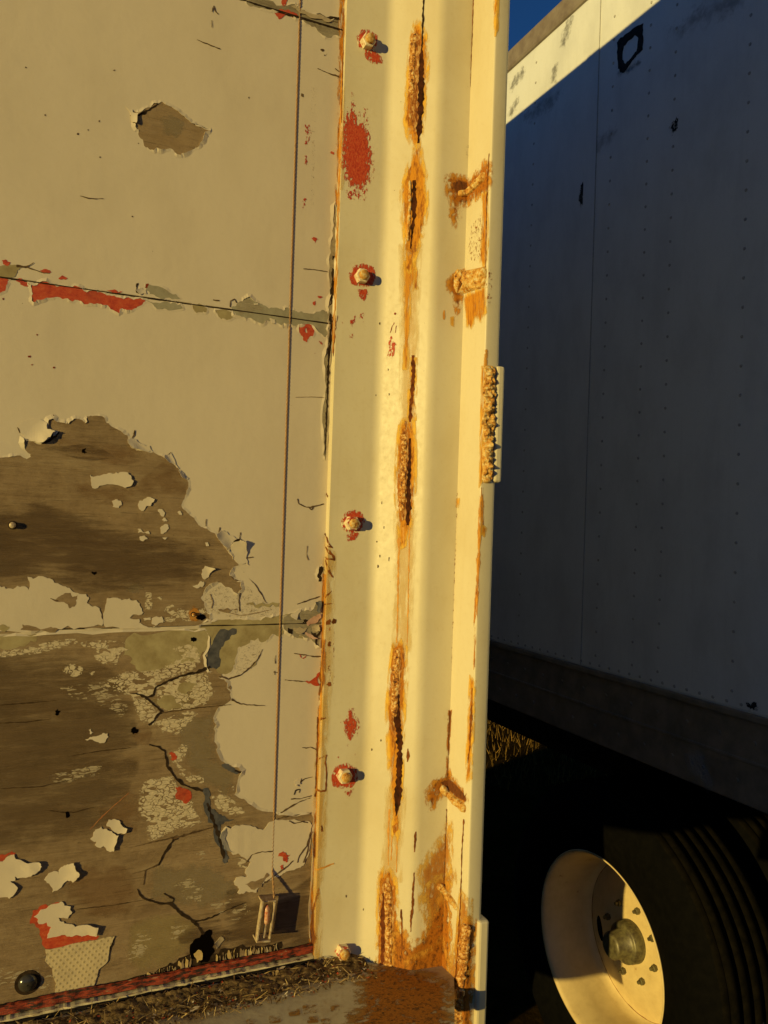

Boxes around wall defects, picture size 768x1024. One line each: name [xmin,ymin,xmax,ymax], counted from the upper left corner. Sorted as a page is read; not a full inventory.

peeling [125,100,211,158]
peeling [330,92,374,200]
peeling [0,201,337,461]
rust [269,0,493,1024]
peeling [0,413,323,1004]
crack [132,666,265,935]
crack [288,653,321,686]